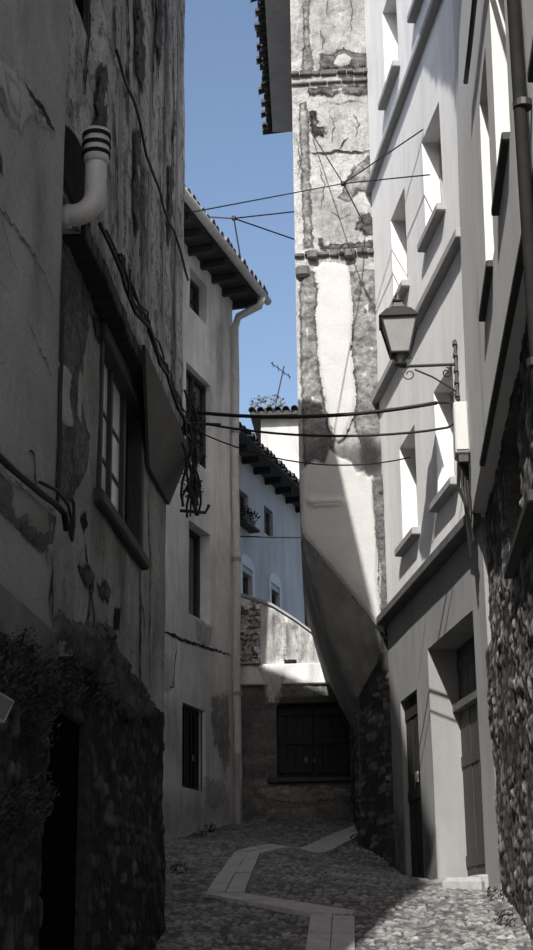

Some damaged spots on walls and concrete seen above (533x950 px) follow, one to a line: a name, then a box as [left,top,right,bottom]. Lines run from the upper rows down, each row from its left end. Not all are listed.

crack [26,84,55,131]
spalling [300,0,367,72]
spalling [298,84,373,251]
crack [320,0,353,48]
flaking render [298,270,337,466]
flaking render [348,269,387,610]